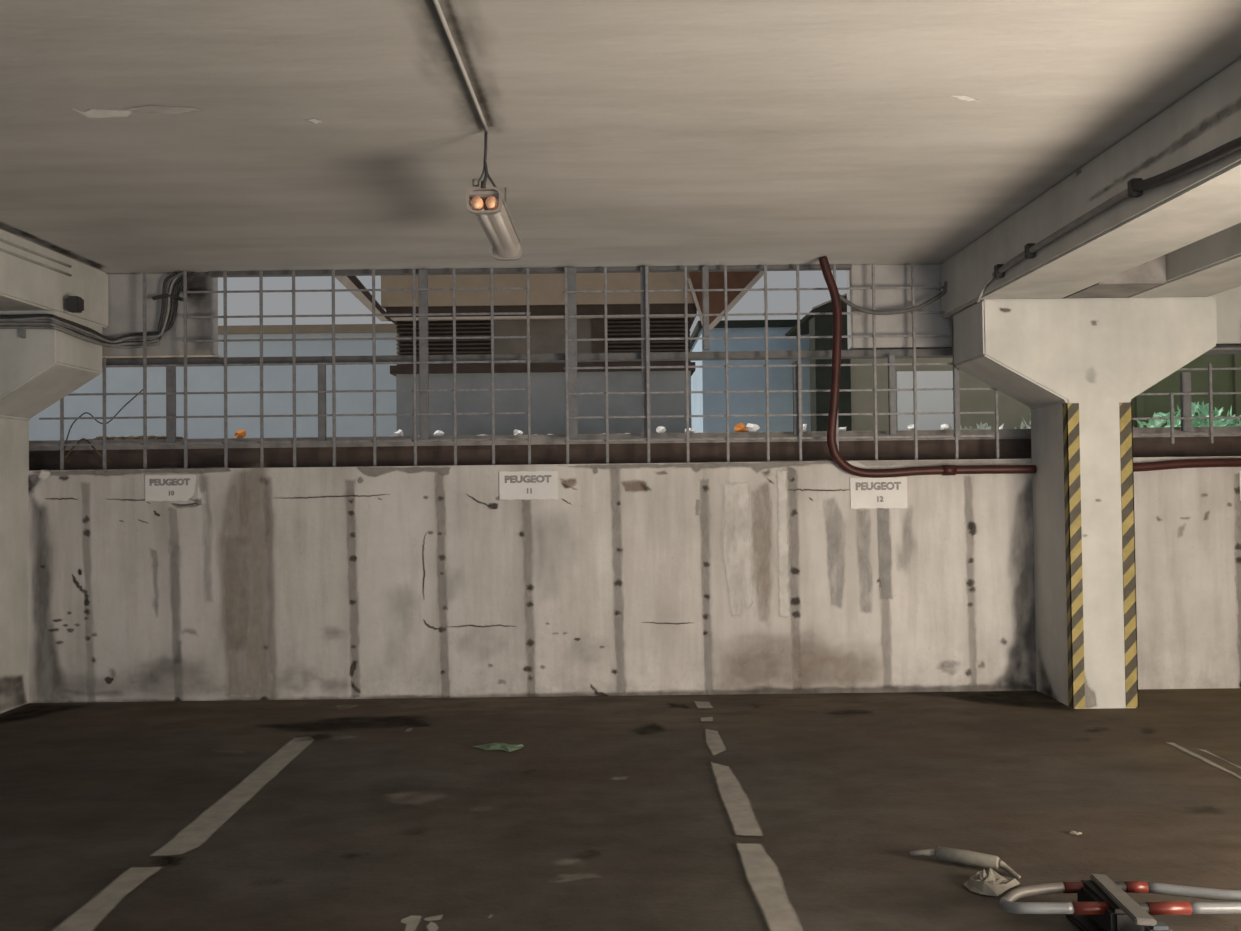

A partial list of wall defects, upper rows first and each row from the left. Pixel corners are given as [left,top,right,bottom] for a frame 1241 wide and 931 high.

water stain [221,483,271,696]
water stain [753,484,770,605]
water stain [827,511,844,606]
water stain [859,509,910,598]
water stain [999,547,1036,690]
water stain [1024,483,1033,519]